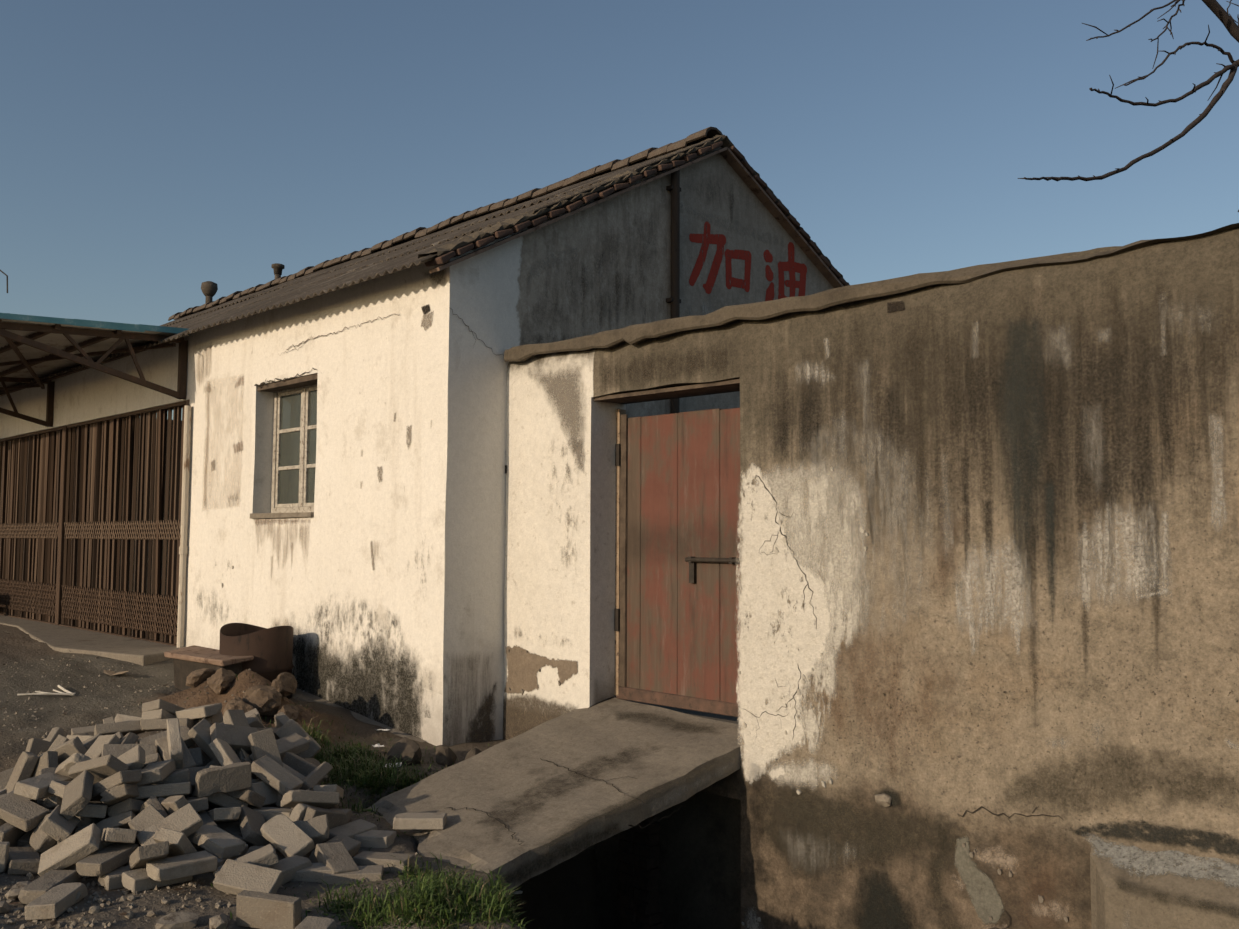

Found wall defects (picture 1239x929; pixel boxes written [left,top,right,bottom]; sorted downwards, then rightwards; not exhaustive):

crack [254,314,400,388]
water stain [540,370,583,468]
water stain [781,364,829,459]
water stain [839,300,1173,658]
crack [755,475,817,627]
water stain [292,606,422,737]
peeling [469,632,578,743]
crack [745,666,801,740]
crack [540,758,647,804]
water stain [761,787,959,929]